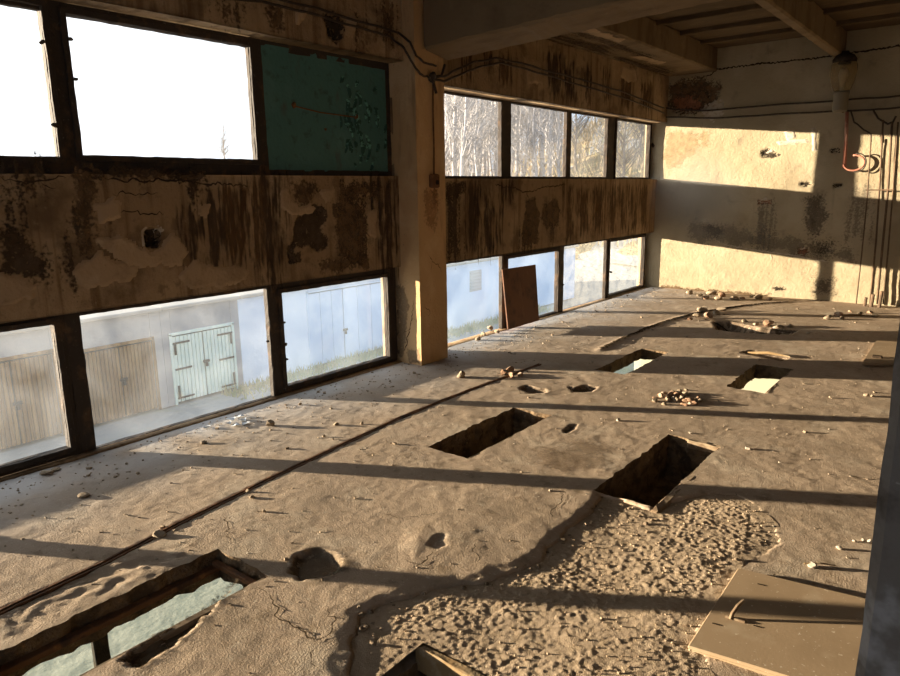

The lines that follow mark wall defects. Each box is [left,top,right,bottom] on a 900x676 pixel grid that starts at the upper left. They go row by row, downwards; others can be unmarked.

flaking render [0,272,38,306]
water stain [0,151,320,295]
flaking render [72,225,249,291]
crack [105,176,248,215]
flaking render [280,186,339,264]
flaking render [367,209,377,239]
water stain [445,179,513,264]
water stain [518,182,648,252]
water stain [805,195,832,253]
water stain [815,277,834,296]
crack [252,588,341,667]